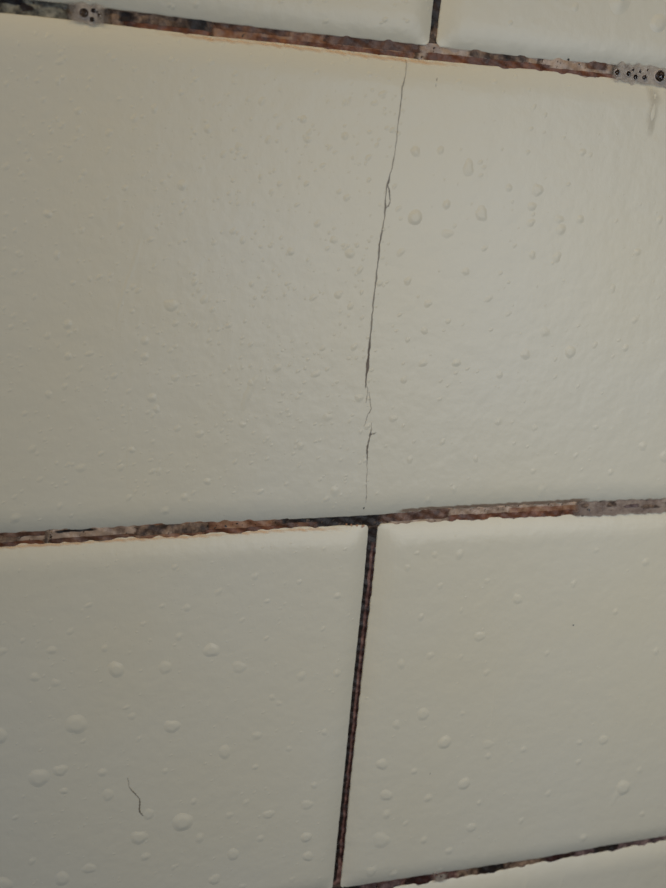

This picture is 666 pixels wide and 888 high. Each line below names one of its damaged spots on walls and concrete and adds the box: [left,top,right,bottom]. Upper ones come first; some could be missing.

crack [365,176,390,383]